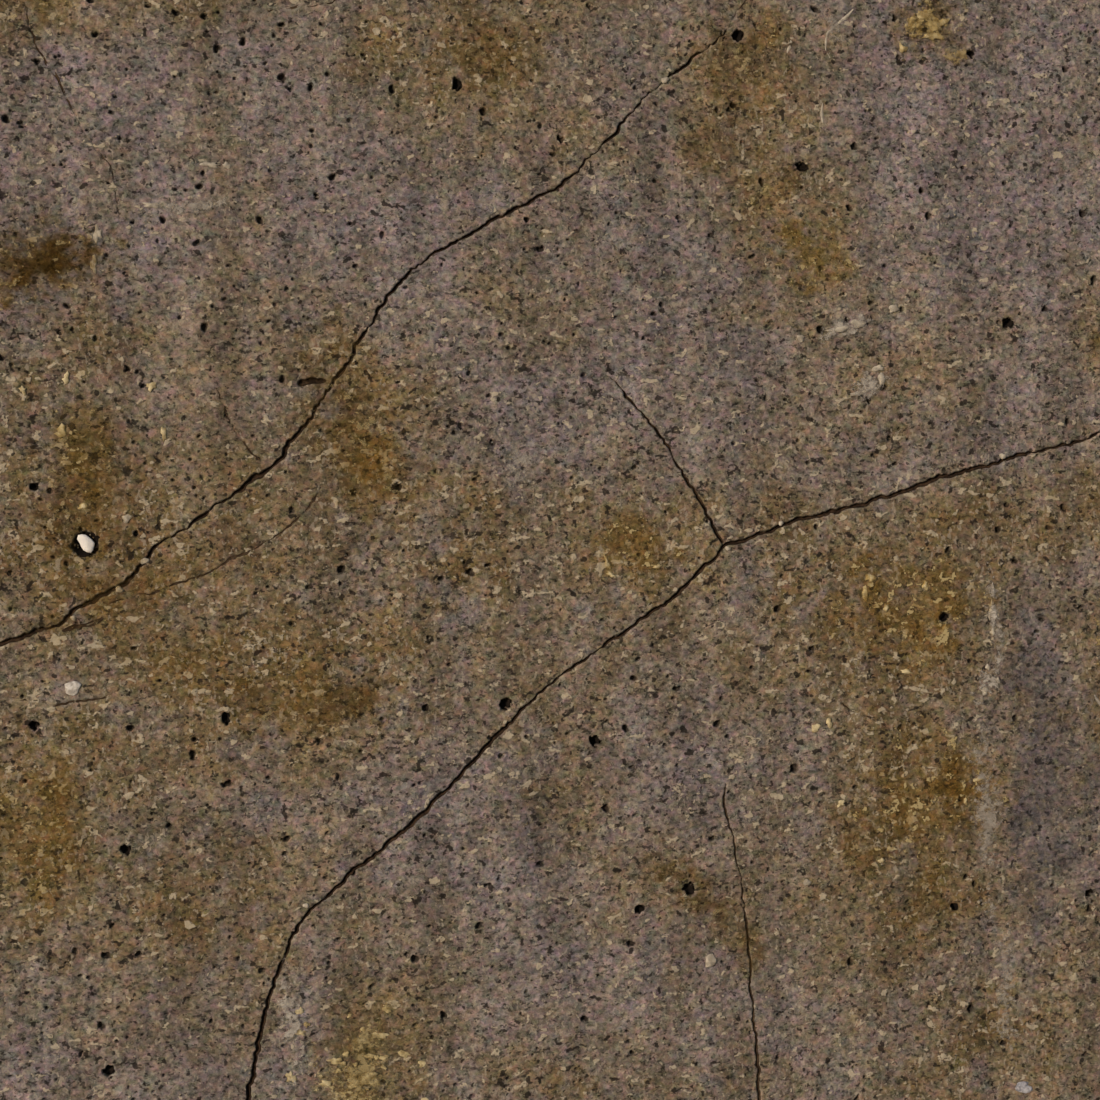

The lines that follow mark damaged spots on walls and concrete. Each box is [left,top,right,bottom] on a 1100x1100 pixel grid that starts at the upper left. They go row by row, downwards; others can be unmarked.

crack [0,0,746,646]
crack [246,374,1100,1100]